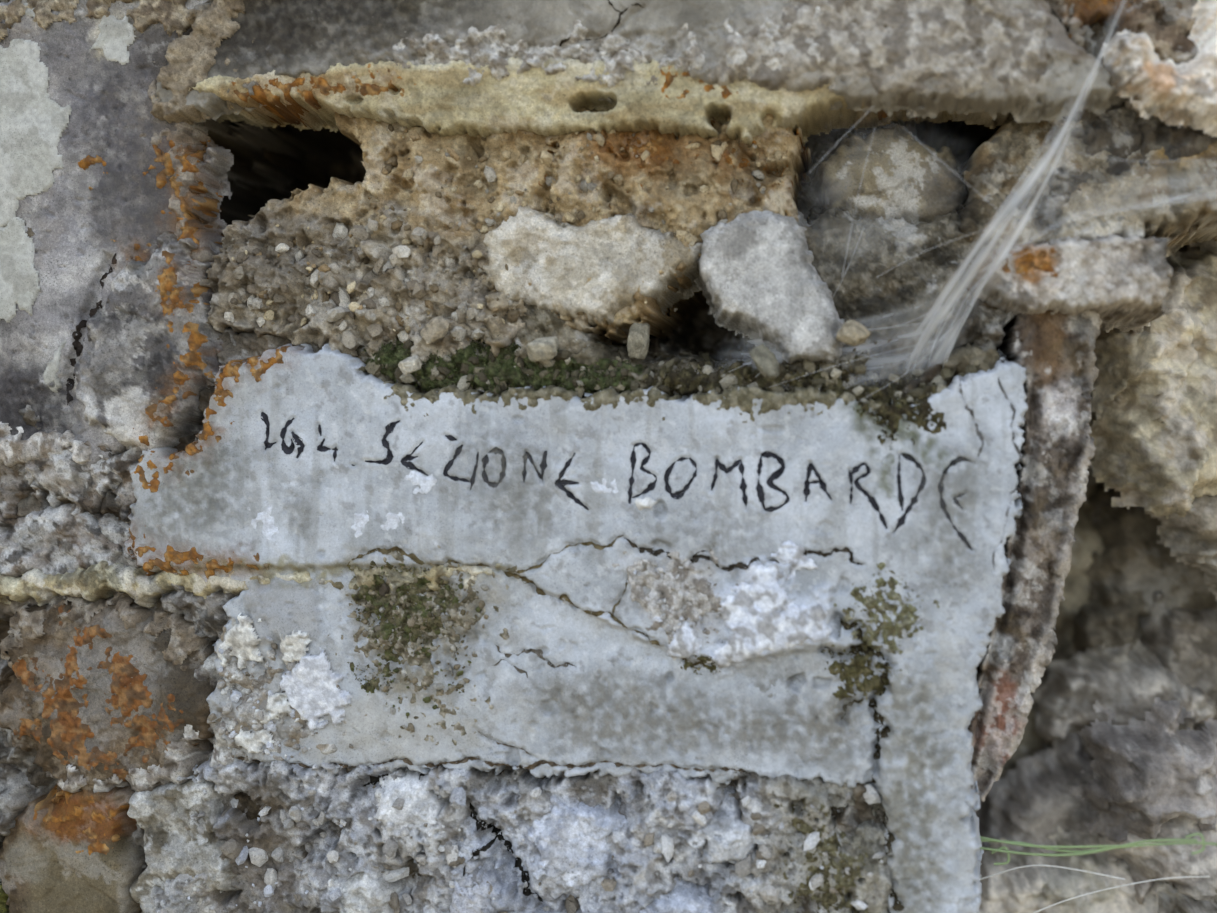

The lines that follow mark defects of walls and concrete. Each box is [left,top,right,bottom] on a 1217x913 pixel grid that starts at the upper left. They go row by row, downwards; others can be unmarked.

crack [559,0,644,47]
crack [347,535,863,666]
peeling [612,540,832,671]
crack [492,645,576,678]
crack [232,731,746,787]
crack [825,617,895,857]
crack [887,889,905,913]